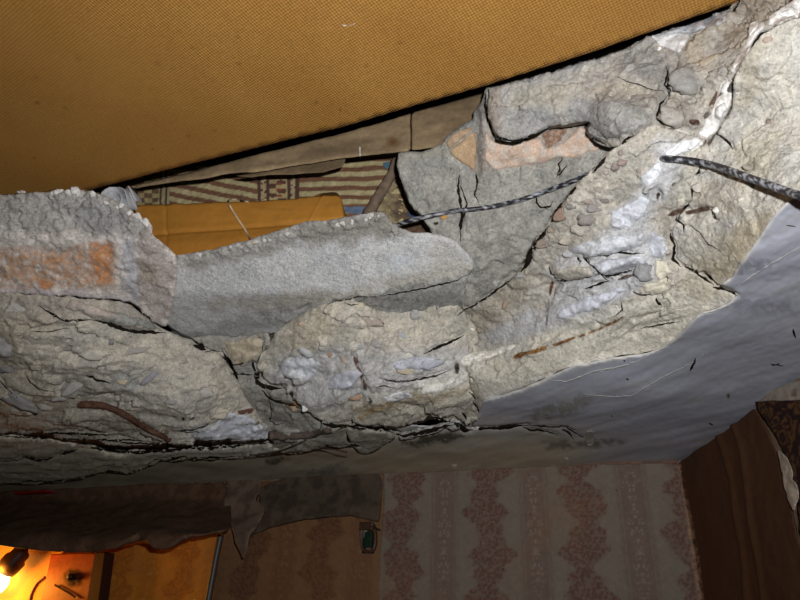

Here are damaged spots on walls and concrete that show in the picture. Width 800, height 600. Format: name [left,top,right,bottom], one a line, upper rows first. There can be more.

crack [484,93,633,173]
crack [618,67,671,127]
flaking render [0,243,115,289]
spalling [191,0,800,441]
crack [457,158,644,316]
crack [614,217,738,329]
corrosion [77,401,172,442]
crack [0,344,302,483]
spalling [0,292,395,485]
crack [318,392,585,448]
corrosion [513,317,623,359]
peeling [682,487,703,600]